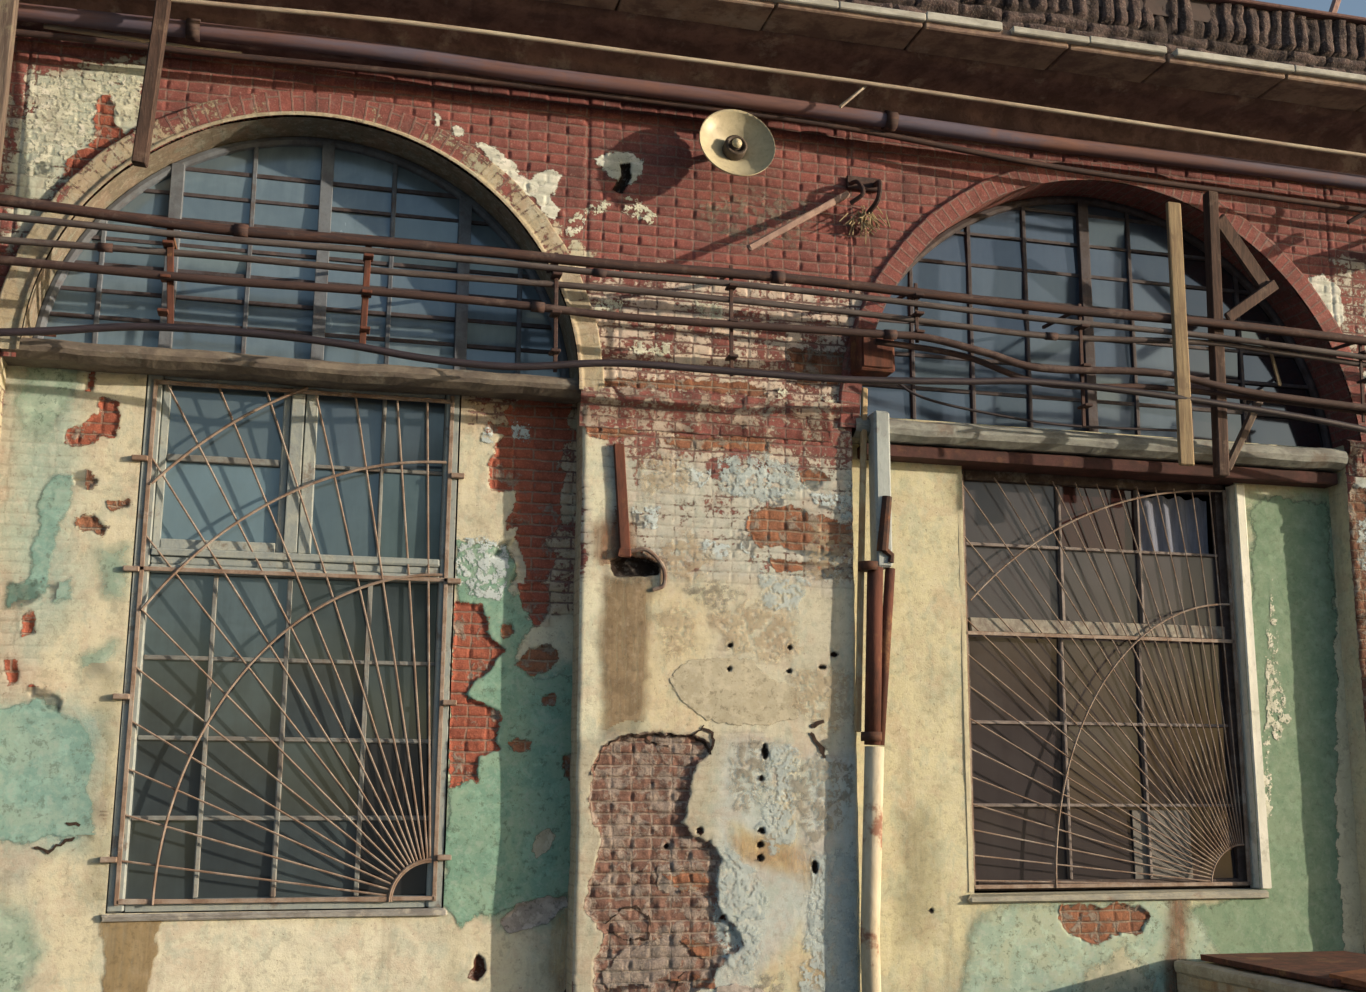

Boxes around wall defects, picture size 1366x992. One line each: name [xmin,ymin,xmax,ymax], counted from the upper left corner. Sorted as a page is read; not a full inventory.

flaking render [42,94,134,194]
spalling [565,163,632,237]
flaking render [64,372,121,447]
flaking render [604,347,845,403]
flaking render [448,601,559,788]
flaking render [482,400,637,627]
damp [601,577,647,729]
hole [610,557,659,577]
flaking render [657,435,853,612]
flaking render [1348,486,1366,727]
flaking render [584,731,861,992]
flaking render [1058,901,1151,945]